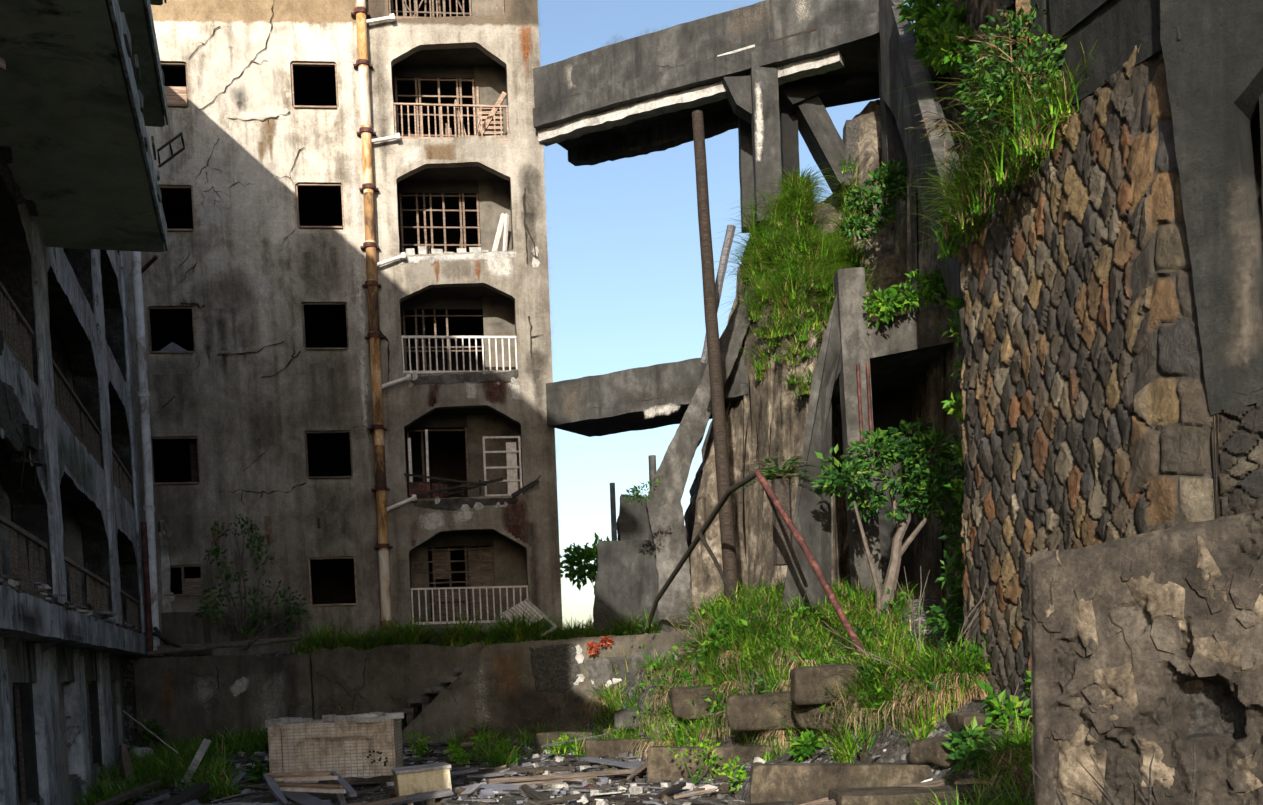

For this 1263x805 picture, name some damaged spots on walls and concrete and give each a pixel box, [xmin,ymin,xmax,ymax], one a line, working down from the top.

crack [194,1,304,208]
crack [159,340,301,412]
crack [219,450,336,515]
rust [503,502,527,543]
spalling [1121,536,1263,737]
spalling [1033,579,1183,805]
spalling [1227,742,1263,793]